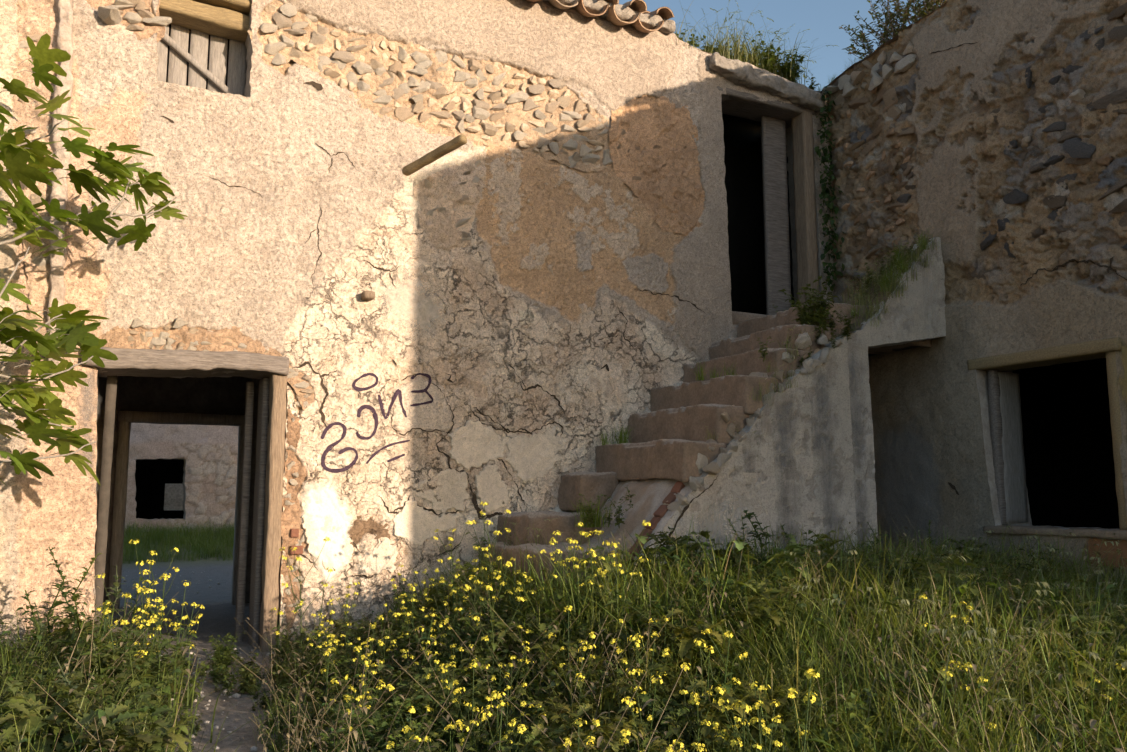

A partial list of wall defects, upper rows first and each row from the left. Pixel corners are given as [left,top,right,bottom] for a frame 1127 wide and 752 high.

flaking render [1079,2,1127,50]
peeling [822,41,917,107]
flaking render [247,0,705,251]
flaking render [1008,88,1127,238]
flaking render [980,218,1016,258]
crack [1020,257,1127,286]
flaking render [97,317,563,633]